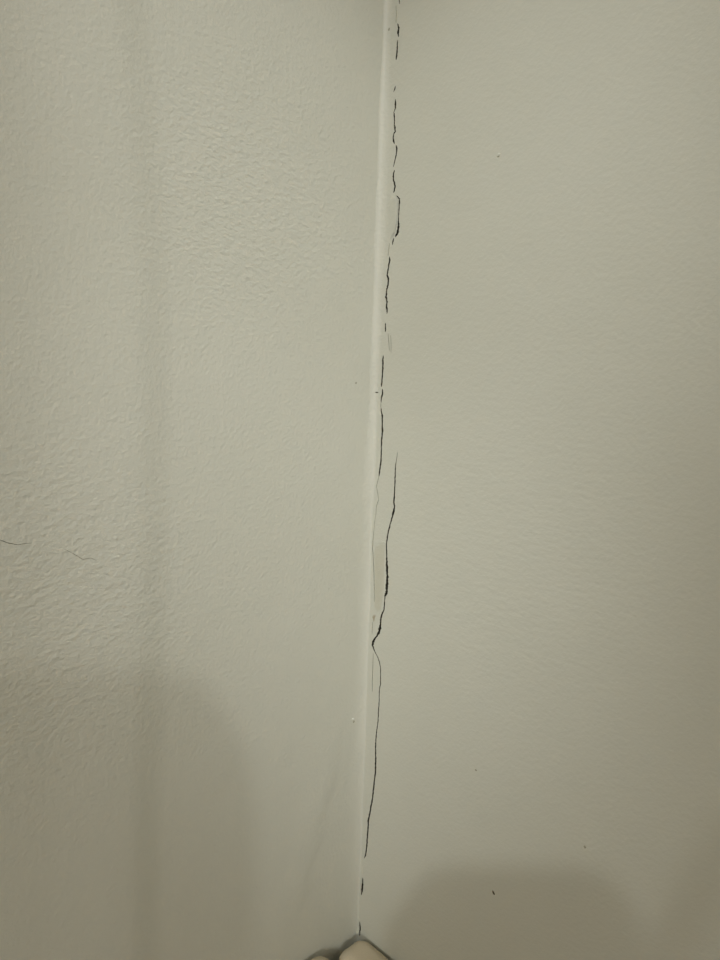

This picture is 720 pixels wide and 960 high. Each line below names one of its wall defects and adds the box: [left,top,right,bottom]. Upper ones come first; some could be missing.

crack [361,86,400,895]